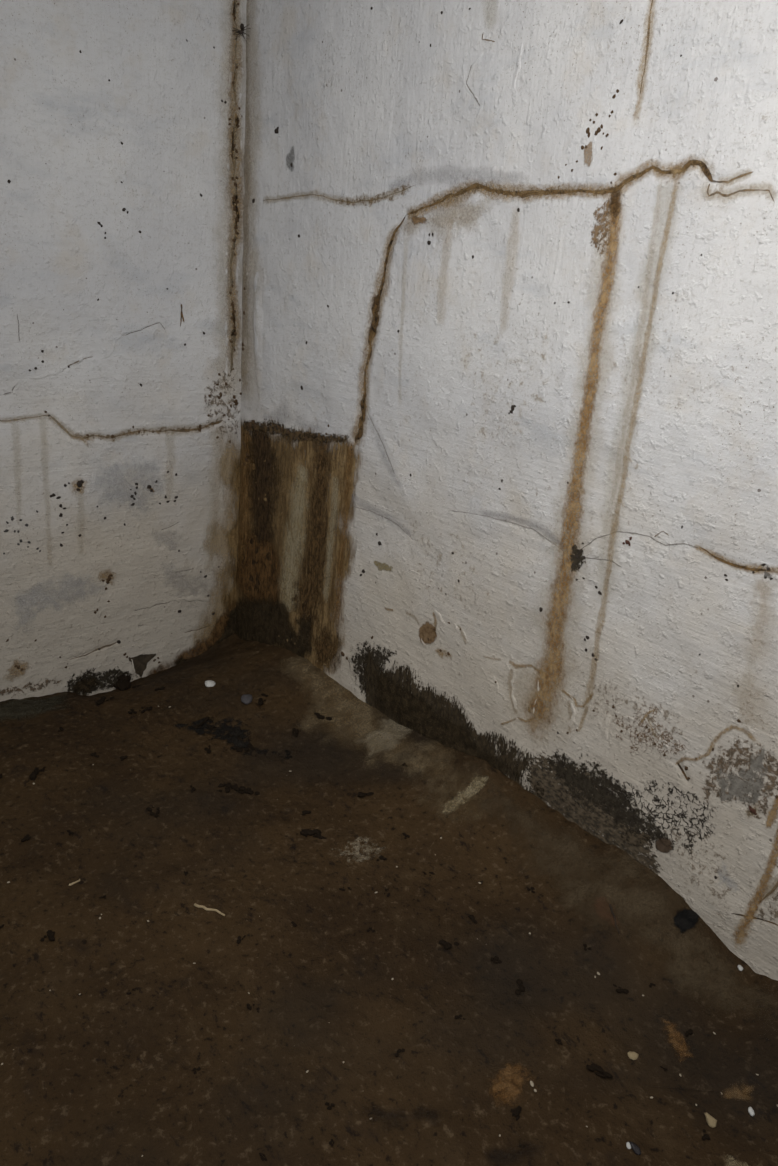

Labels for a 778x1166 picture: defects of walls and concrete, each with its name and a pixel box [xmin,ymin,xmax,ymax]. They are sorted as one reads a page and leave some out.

corrosion [558,89,619,179]
crack [228,0,774,442]
crack [0,411,223,442]
corrosion [528,173,621,730]
leakage [59,443,241,695]
crack [582,531,778,581]
leakage [348,641,714,874]
leakage [330,837,381,862]
corrosion [735,798,778,944]